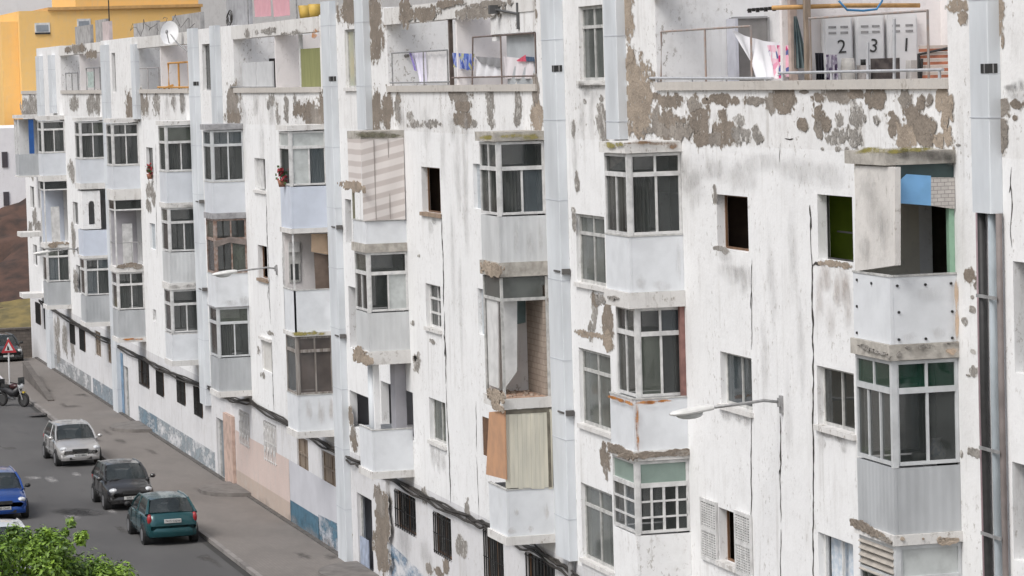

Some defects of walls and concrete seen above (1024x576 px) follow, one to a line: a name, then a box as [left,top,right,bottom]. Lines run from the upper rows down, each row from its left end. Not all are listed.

peeling [369,0,388,66]
peeling [223,78,243,123]
peeling [266,89,324,125]
peeling [372,83,496,130]
peeling [513,73,544,141]
peeling [624,0,961,154]
peeling [574,290,620,353]
crack [809,205,820,574]
rust [608,395,671,447]
spalling [599,440,690,481]
peeling [425,534,468,576]
spalling [849,518,905,544]